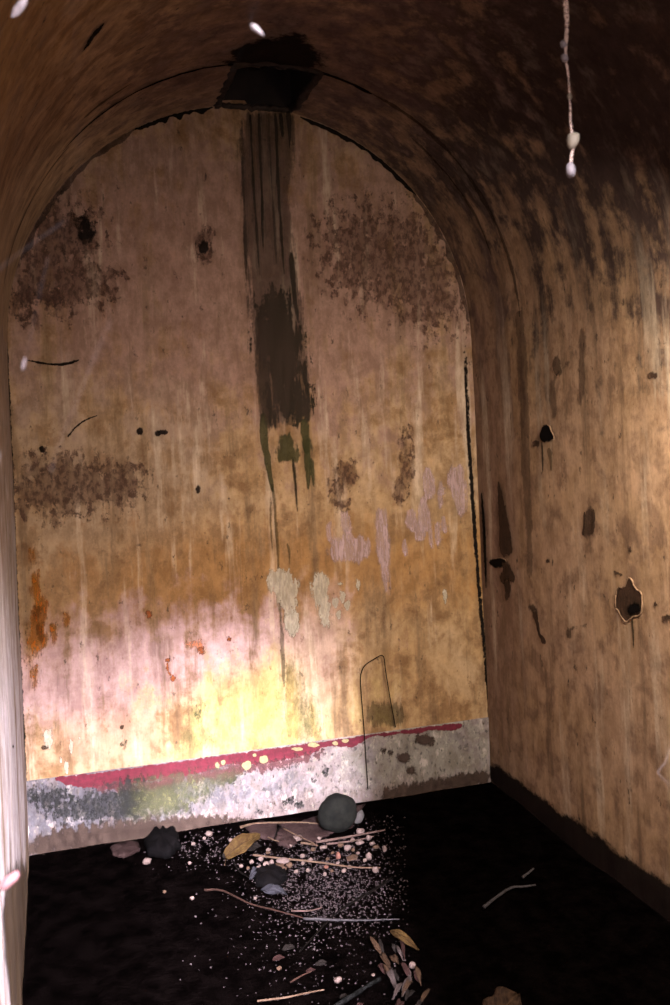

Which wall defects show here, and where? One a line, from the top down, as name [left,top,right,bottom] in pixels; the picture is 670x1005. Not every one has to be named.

water stain [306,192,470,348]
water stain [248,111,317,511]
water stain [12,446,153,528]
water stain [327,458,359,510]
water stain [394,424,416,503]
corrosion [24,547,70,688]
peeling [266,568,350,637]
peeling [41,727,53,750]
peeling [55,723,462,793]